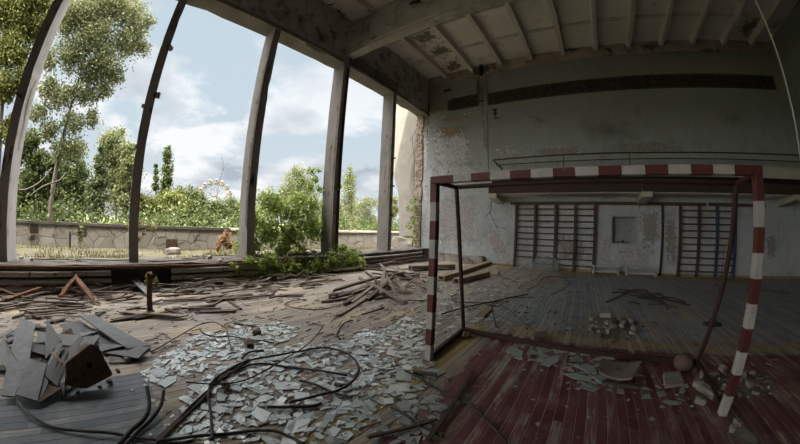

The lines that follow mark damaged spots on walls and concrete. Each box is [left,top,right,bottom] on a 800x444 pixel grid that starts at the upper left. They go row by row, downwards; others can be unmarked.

peeling [411,30,461,72]
peeling [423,122,487,250]